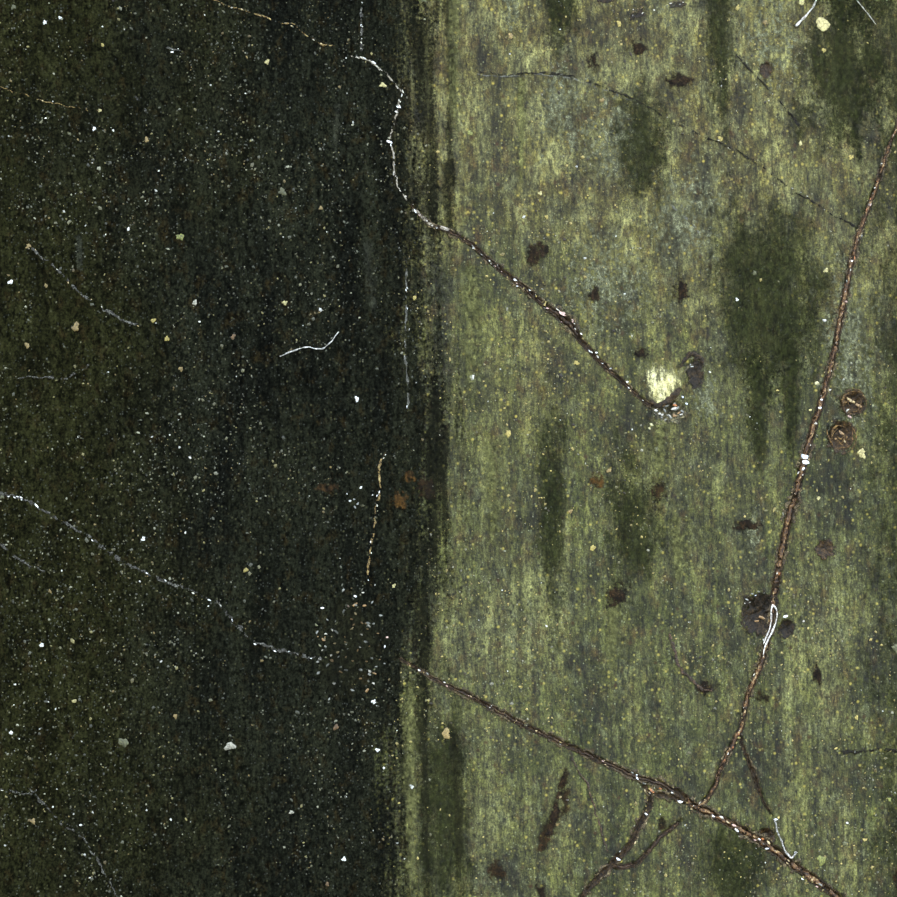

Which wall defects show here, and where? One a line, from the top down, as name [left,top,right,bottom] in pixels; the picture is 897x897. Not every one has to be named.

water stain [515,45,654,206]
water stain [626,38,648,55]
water stain [665,72,694,89]
crack [735,54,799,126]
water stain [838,0,897,187]
water stain [527,143,734,353]
water stain [746,339,800,466]
water stain [810,231,897,605]
crack [399,71,897,897]
water stain [732,500,763,560]
water stain [605,580,630,672]
water stain [813,662,822,687]